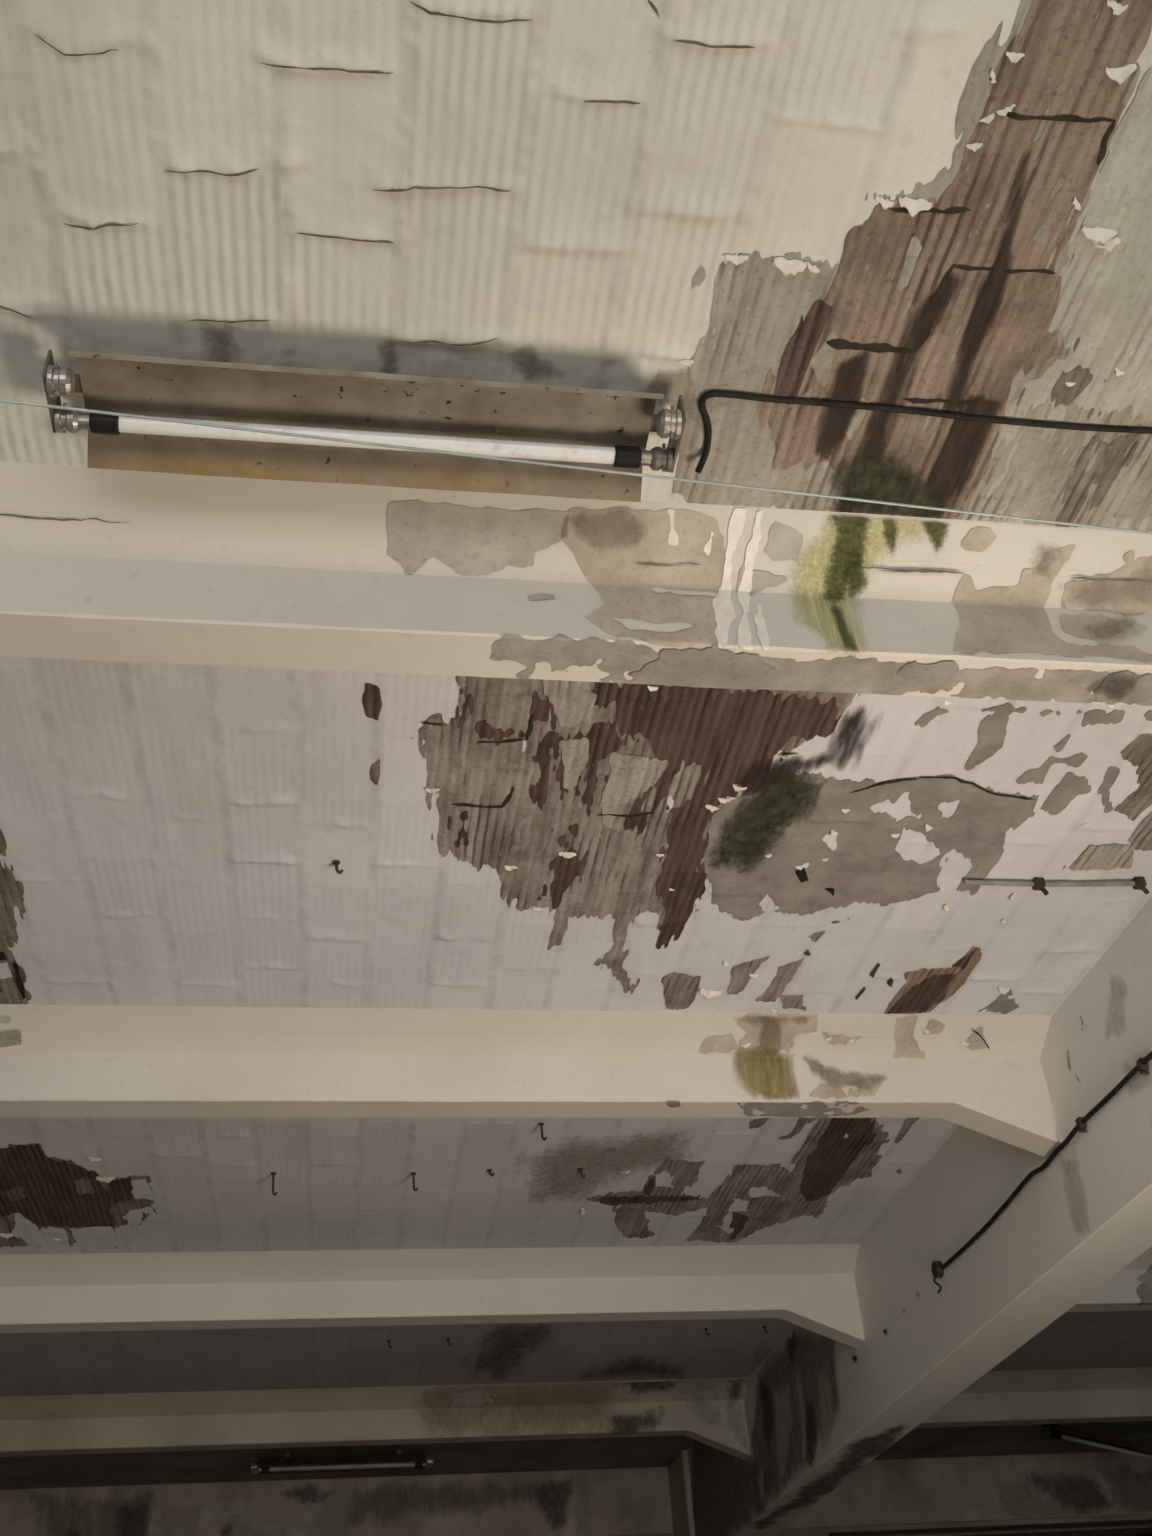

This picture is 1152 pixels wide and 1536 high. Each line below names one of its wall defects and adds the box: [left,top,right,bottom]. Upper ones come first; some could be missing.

crack [261,63,391,74]
crack [168,168,259,176]
crack [376,185,510,193]
crack [298,233,393,243]
crack [0,514,127,523]
damp [667,509,679,546]
damp [703,508,803,651]
crack [862,566,963,574]
peeling [387,0,1152,1243]
peeling [0,829,32,1047]
peeling [0,1143,157,1249]
damp [429,1330,902,1536]